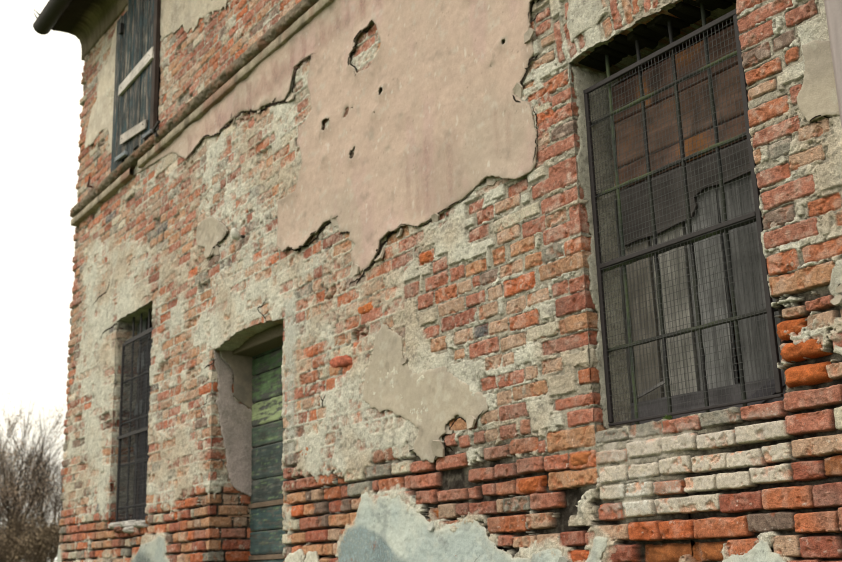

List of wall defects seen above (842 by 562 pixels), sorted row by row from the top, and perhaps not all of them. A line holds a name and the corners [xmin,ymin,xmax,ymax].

flaking render [85,15,121,152]
flaking render [797,40,840,123]
flaking render [137,0,538,277]
flaking render [829,259,842,306]
spalling [777,317,842,388]
flaking render [213,350,256,497]
flaking render [362,324,489,463]
spalling [518,475,548,495]
flaking render [131,535,170,562]
flaking render [284,549,320,562]
flaking render [338,492,608,562]
spalling [646,540,786,562]